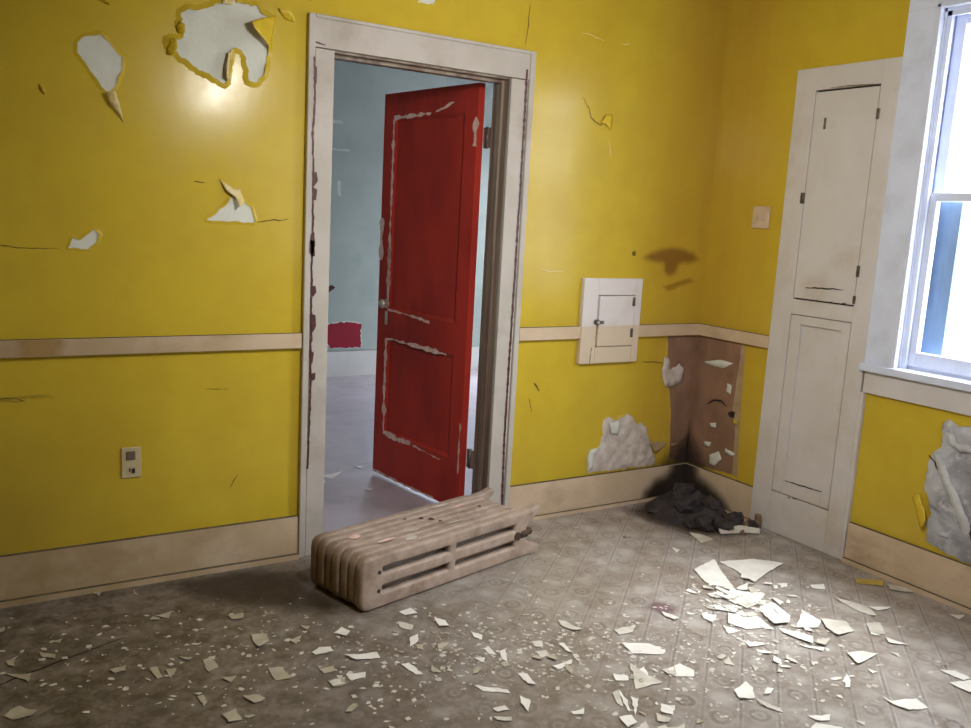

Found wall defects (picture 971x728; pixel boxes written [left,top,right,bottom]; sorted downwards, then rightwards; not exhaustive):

peeling [73,30,126,122]
peeling [162,0,276,89]
crack [584,99,613,154]
peeling [65,227,103,252]
peeling [204,179,287,226]
flaking render [584,335,746,477]
flaking render [912,416,971,565]